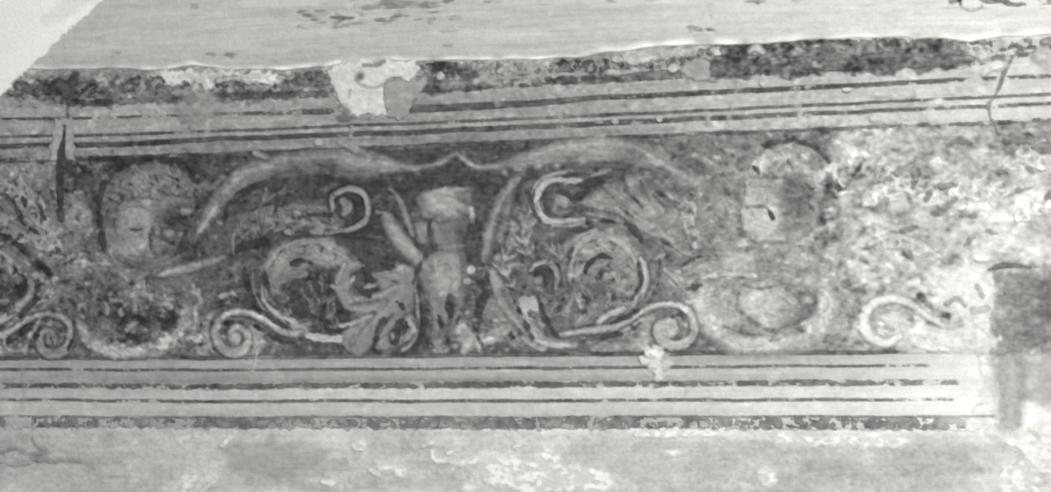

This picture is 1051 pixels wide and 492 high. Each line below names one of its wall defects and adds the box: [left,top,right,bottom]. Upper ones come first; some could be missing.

crack [55,71,80,221]
peeling [338,104,356,121]
crack [987,42,1024,134]